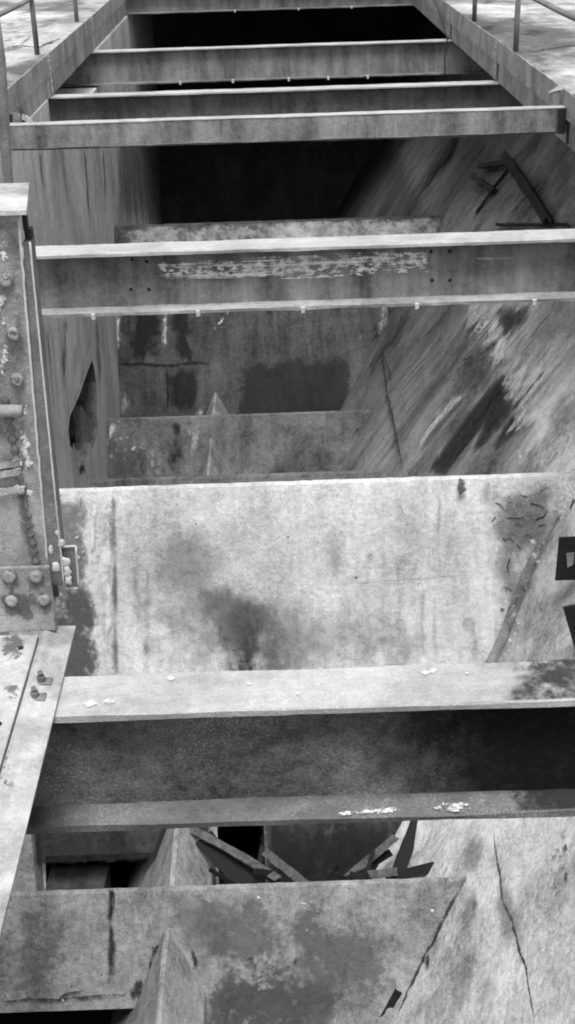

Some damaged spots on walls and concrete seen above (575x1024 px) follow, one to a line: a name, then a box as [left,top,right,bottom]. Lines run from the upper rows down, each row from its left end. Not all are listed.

leakage [239,357,350,414]
crack [352,348,428,471]
leakage [423,304,536,473]
leakage [55,500,116,677]
leakage [205,591,280,671]
leakage [211,896,383,1024]
crack [399,893,457,1011]
crack [494,839,534,1013]